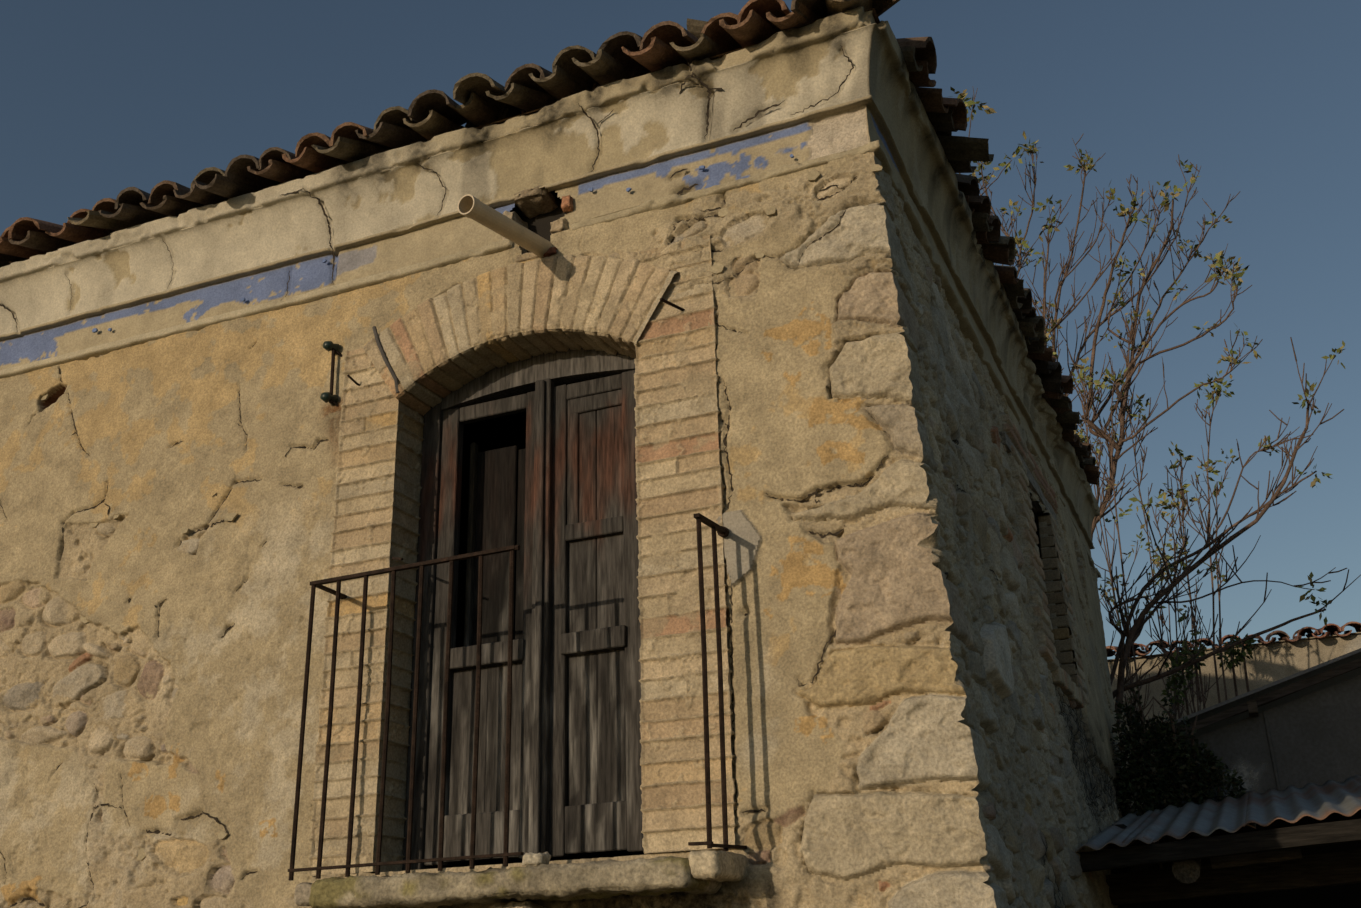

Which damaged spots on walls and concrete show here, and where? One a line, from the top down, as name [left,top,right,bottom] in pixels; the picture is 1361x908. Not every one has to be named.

crack [578,103,613,172]
peeling [502,109,883,262]
spalling [646,206,777,302]
peeling [0,302,166,370]
spalling [41,387,67,410]
crack [58,368,89,455]
crack [61,486,110,557]
spalling [0,515,178,734]
peeling [1,876,50,908]